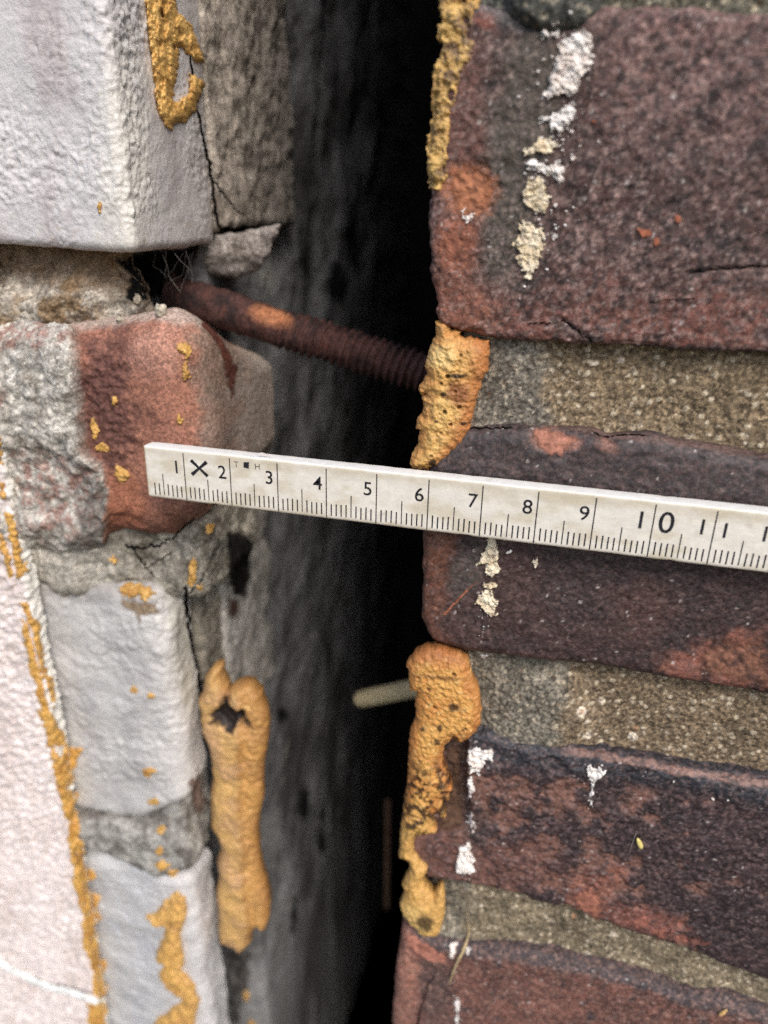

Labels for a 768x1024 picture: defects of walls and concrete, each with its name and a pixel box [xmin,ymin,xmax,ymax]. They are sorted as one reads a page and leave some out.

crack [196,102,279,231]
rust [202,322,238,398]
crack [124,518,194,577]
crack [182,573,204,693]